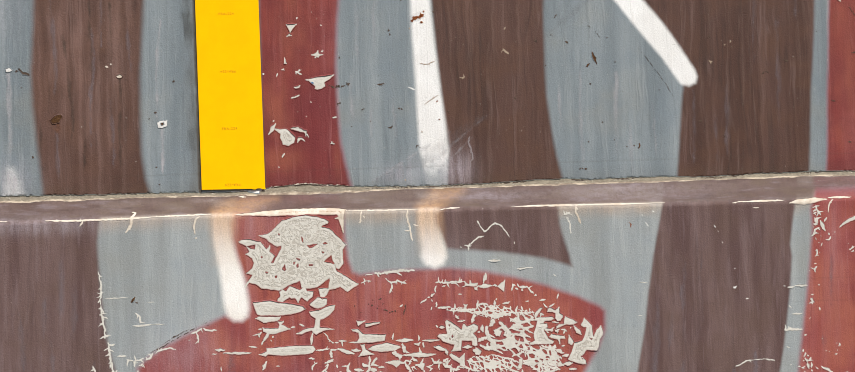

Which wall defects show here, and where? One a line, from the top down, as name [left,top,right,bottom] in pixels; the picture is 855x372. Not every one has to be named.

peeling [276,57,350,99]
peeling [268,120,309,168]
peeling [809,205,855,273]
peeling [212,207,479,372]
peeling [420,273,604,371]
peeling [797,349,833,372]